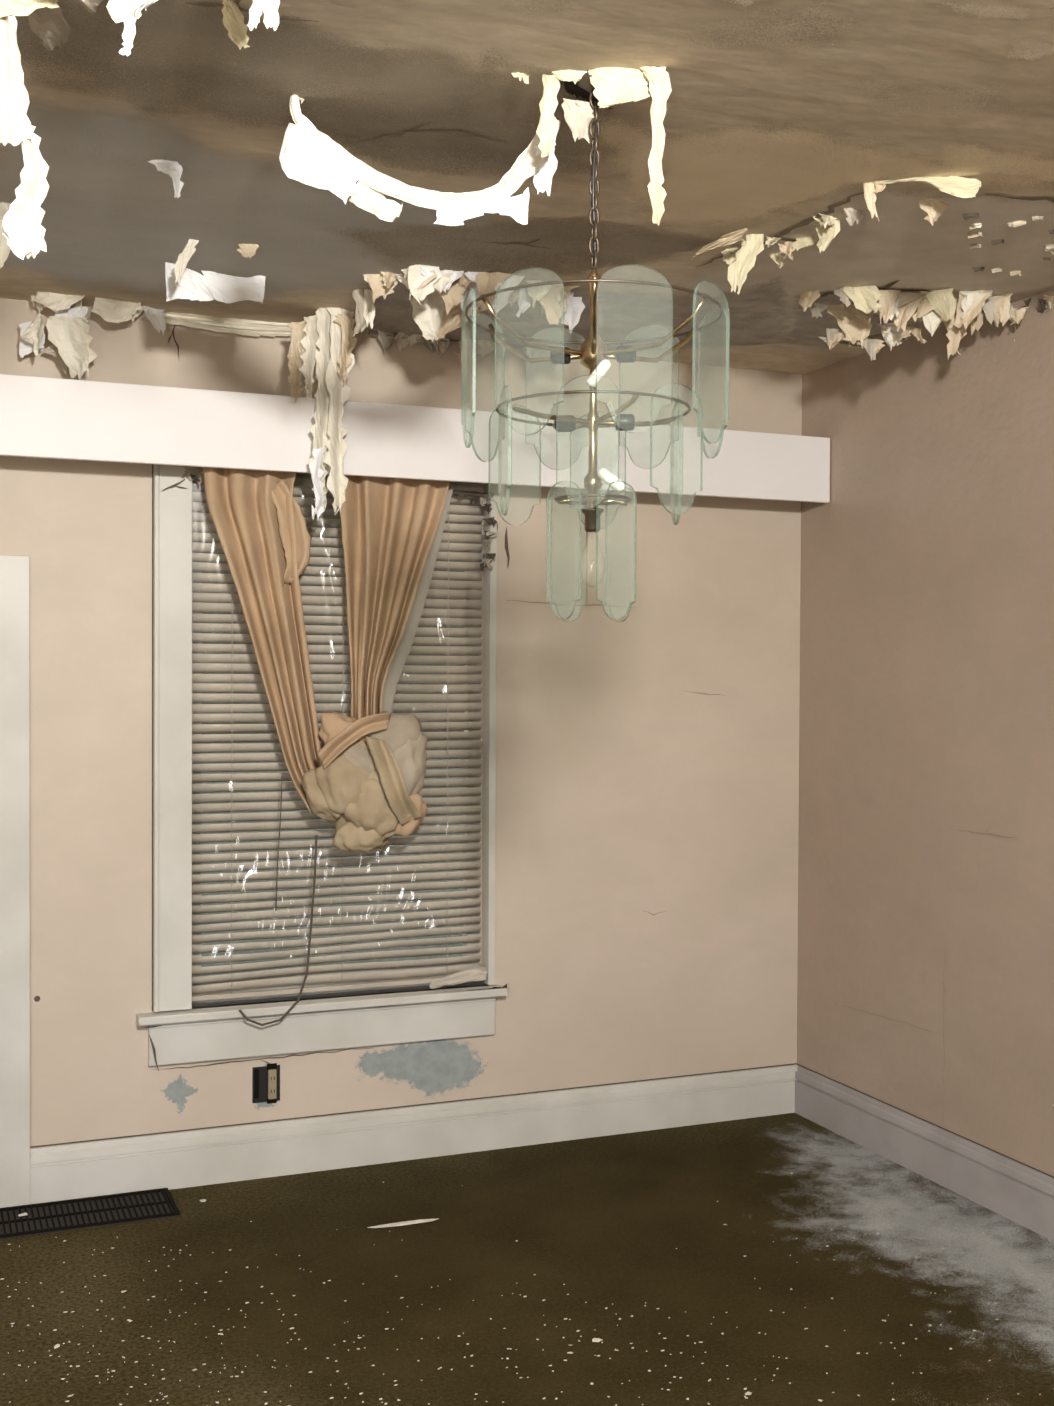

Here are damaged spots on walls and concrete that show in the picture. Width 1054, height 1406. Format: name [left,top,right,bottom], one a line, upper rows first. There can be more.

peeling [79,0,158,56]
peeling [0,0,70,269]
peeling [148,159,184,198]
damp [0,0,740,306]
peeling [279,66,672,226]
peeling [161,1073,199,1115]
peeling [354,1039,488,1101]